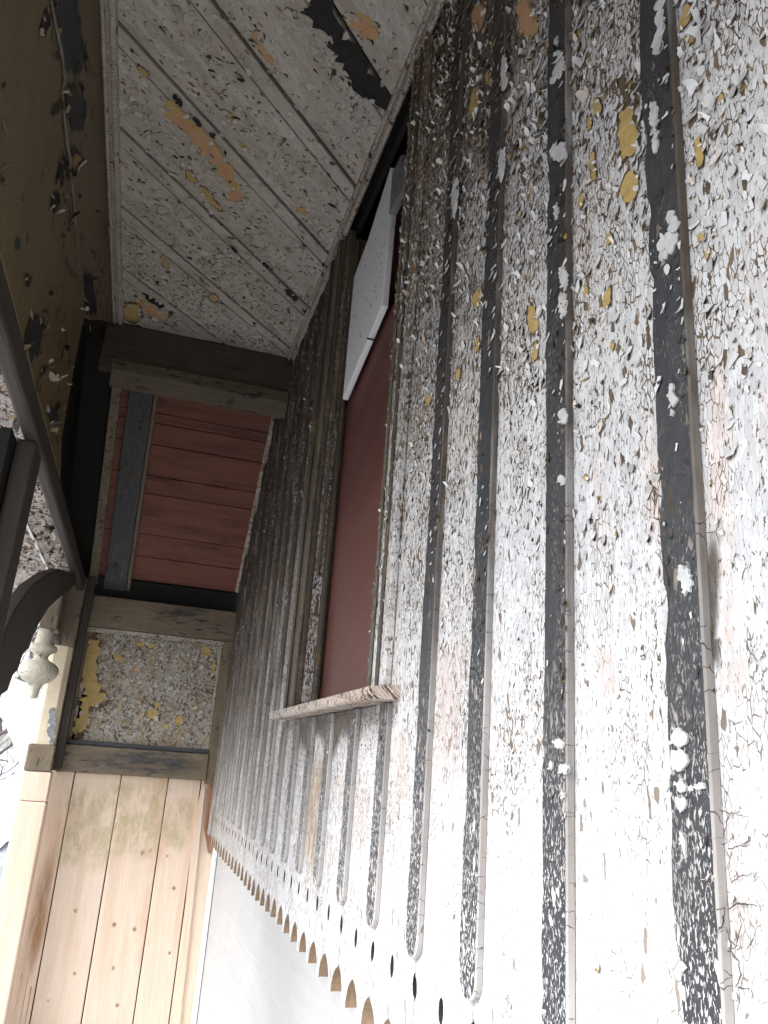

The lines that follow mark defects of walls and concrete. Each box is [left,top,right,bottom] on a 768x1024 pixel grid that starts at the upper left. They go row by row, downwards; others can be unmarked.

peeling [17,0,768,775]
crack [747,641,764,671]
crack [720,789,757,1020]